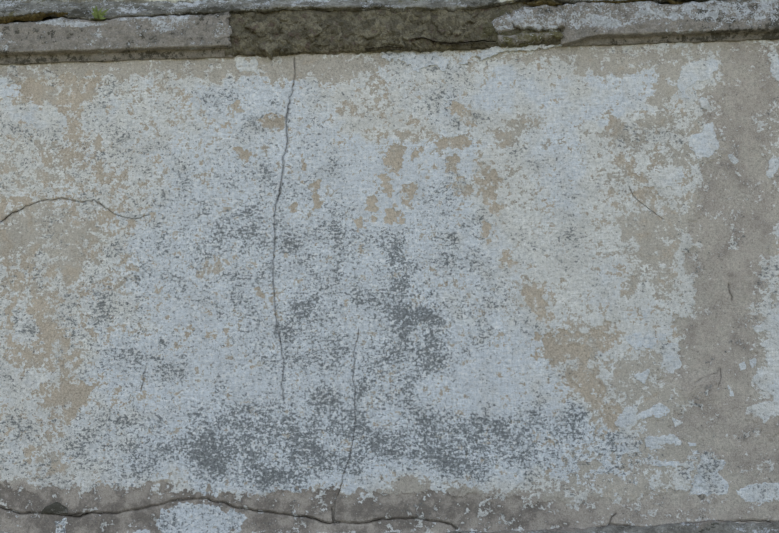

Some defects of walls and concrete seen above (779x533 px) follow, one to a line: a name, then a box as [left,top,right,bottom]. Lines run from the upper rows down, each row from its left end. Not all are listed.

peeling [0,58,215,135]
spalling [223,0,566,85]
peeling [565,43,684,78]
peeling [352,142,425,232]
peeling [433,101,505,245]
peeling [627,166,684,221]
peeling [520,278,556,328]
peeling [645,39,779,524]
peeling [45,372,95,427]
peeling [530,317,670,435]
crack [64,429,454,527]
peeling [0,479,710,533]